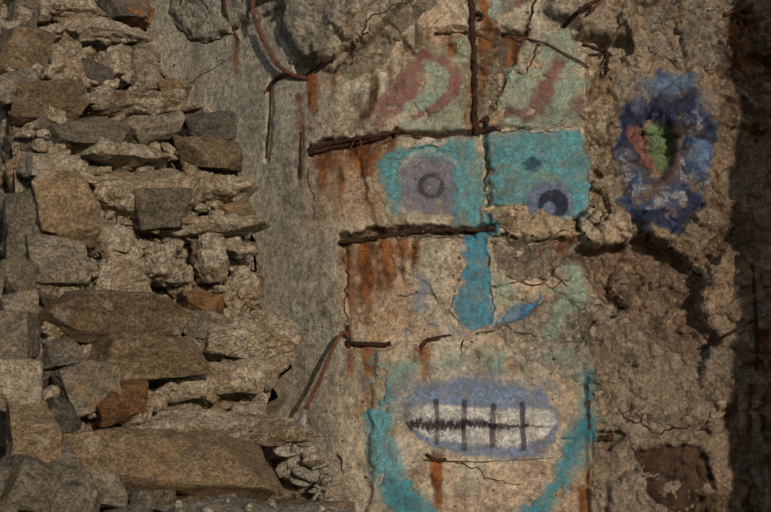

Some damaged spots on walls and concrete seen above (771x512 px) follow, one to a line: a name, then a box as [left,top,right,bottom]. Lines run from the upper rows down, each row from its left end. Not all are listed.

spalling [168,0,282,40]
spalling [338,0,438,81]
rust [249,0,612,186]
crack [342,248,350,331]
rust [340,226,494,320]
spalling [483,204,727,432]
rust [304,325,392,410]
rust [425,453,447,510]
crack [423,457,557,485]
rust [561,382,614,512]
spalling [590,439,694,512]
leakage [631,445,718,512]